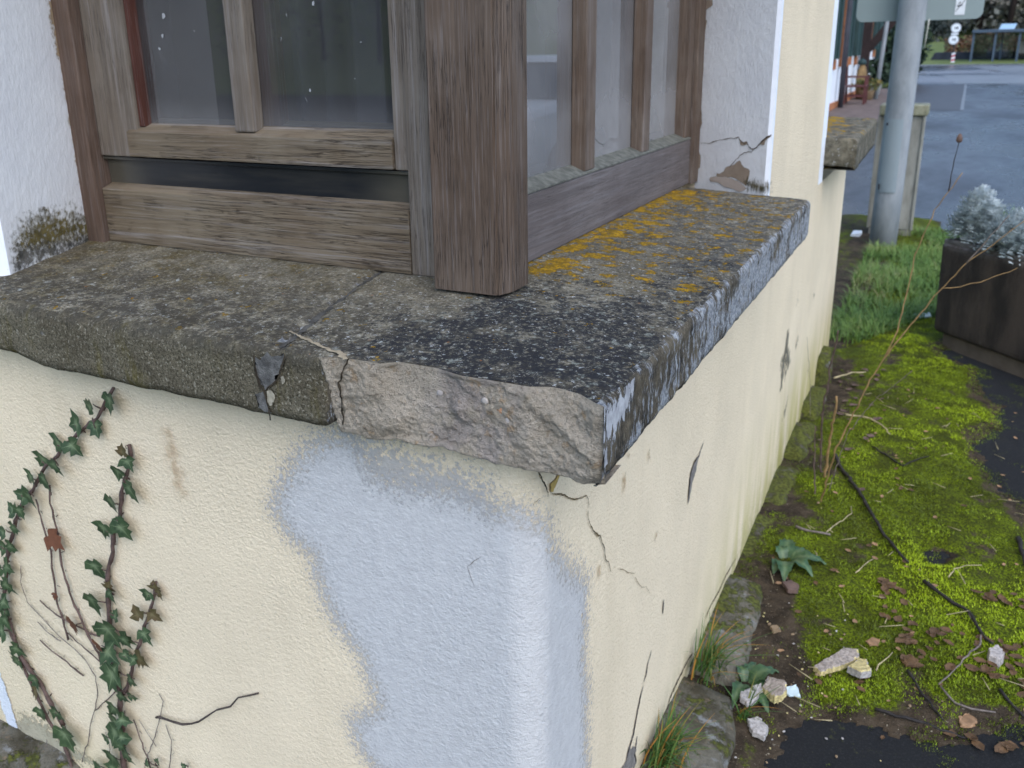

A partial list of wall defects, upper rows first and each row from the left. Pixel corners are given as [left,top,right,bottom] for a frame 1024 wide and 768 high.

peeling [710,161,750,192]
crack [707,135,771,168]
spalling [267,376,285,406]
crack [253,331,349,425]
crack [533,472,650,593]
crack [622,653,651,768]